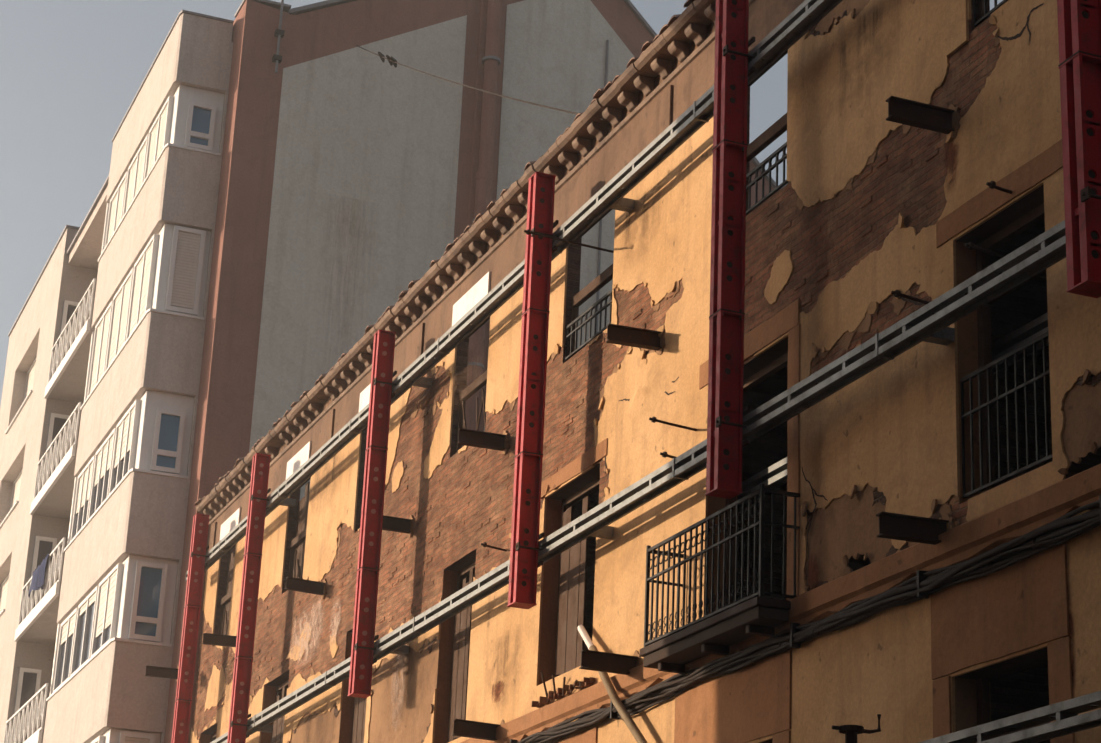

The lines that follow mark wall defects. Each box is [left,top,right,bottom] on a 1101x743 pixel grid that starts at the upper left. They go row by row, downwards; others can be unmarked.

flaking render [930,15,1002,118]
flaking render [744,124,953,335]
flaking render [612,280,684,337]
flaking render [810,283,933,375]
flaking render [540,332,657,510]
flaking render [1058,369,1101,479]
flaking render [375,362,518,641]
flaking render [802,484,917,591]
flaking render [931,495,968,529]
flaking render [248,520,360,709]
flaking render [369,637,439,743]